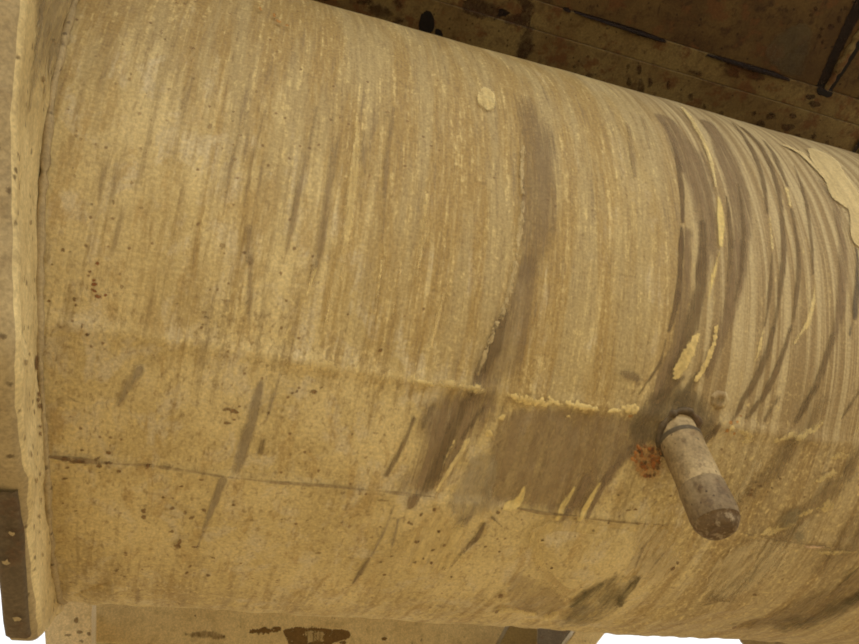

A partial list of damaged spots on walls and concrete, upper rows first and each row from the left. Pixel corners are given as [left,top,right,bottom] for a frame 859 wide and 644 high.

rust [463,0,534,59]
leakage [407,127,554,509]
leakage [453,107,750,528]
leakage [732,123,859,511]
peeling [673,333,700,380]
peeling [694,325,719,382]
peeling [508,392,639,417]
leakage [385,417,415,476]
peeling [436,438,470,492]
leakage [442,517,502,570]
peeling [249,626,350,644]